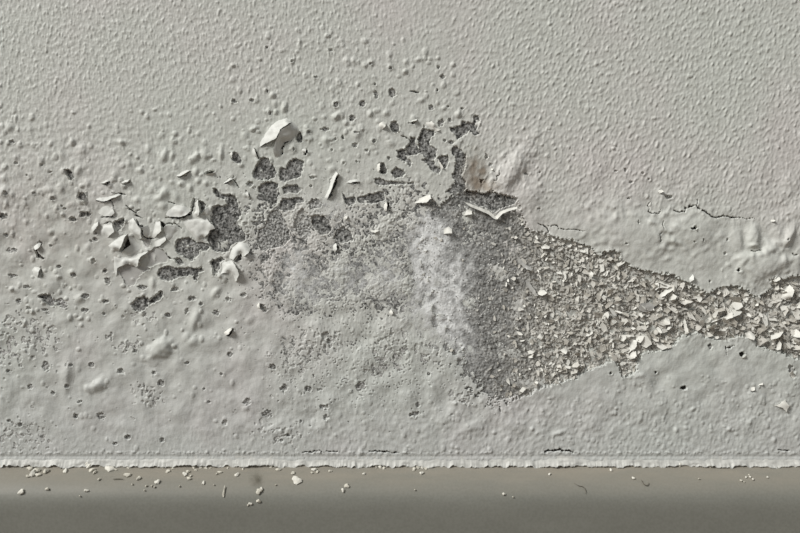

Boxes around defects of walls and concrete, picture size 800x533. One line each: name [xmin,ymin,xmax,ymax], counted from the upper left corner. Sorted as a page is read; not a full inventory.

crack [647,205,750,238]
spalling [71,112,800,418]
spalling [0,299,64,373]